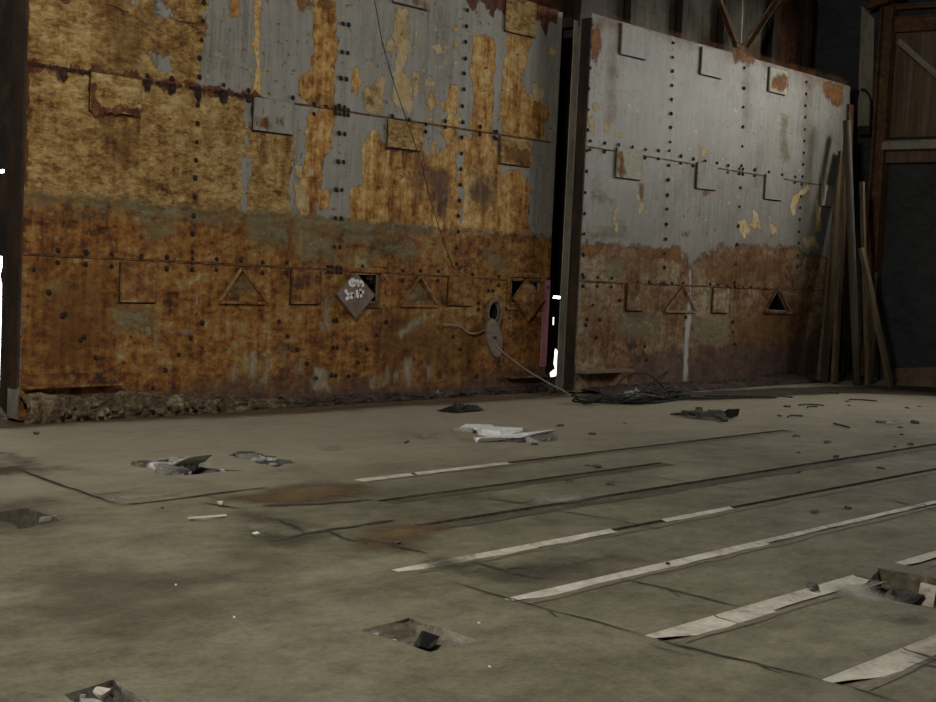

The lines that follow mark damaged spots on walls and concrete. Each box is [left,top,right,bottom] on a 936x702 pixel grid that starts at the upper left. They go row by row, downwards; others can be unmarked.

peeling [157,1,173,18]
peeling [149,51,171,73]
peeling [363,7,436,114]
peeling [294,163,314,215]
peeling [790,184,810,216]
peeling [737,209,778,239]
corrosion [638,245,688,261]
spalling [504,500,936,601]
spalling [645,551,936,638]
spalling [362,618,477,652]
spalling [822,634,936,683]
spalling [64,679,155,702]